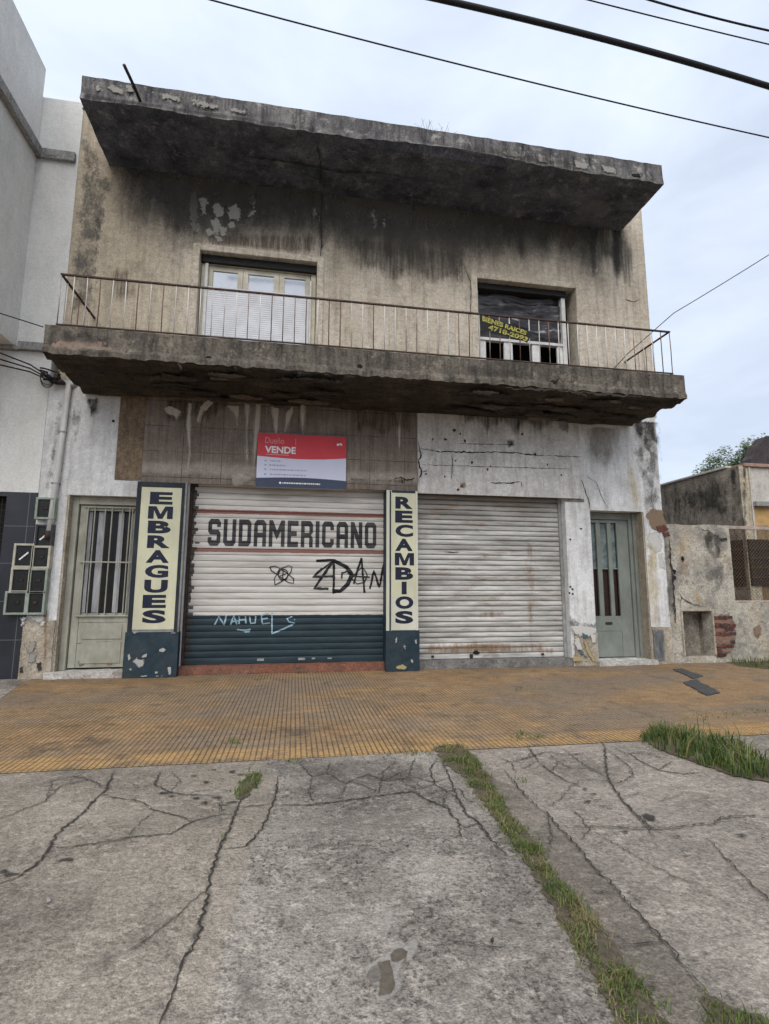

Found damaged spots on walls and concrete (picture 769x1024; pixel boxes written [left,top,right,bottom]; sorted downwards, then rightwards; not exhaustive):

peeling [96,84,133,95]
peeling [160,93,246,114]
water stain [74,146,109,309]
peeling [189,194,256,242]
water stain [209,235,312,250]
water stain [575,200,631,276]
crack [393,443,608,508]
peeling [646,509,684,580]
peeling [571,624,597,662]
flaking render [714,614,736,657]
peeling [128,654,171,677]